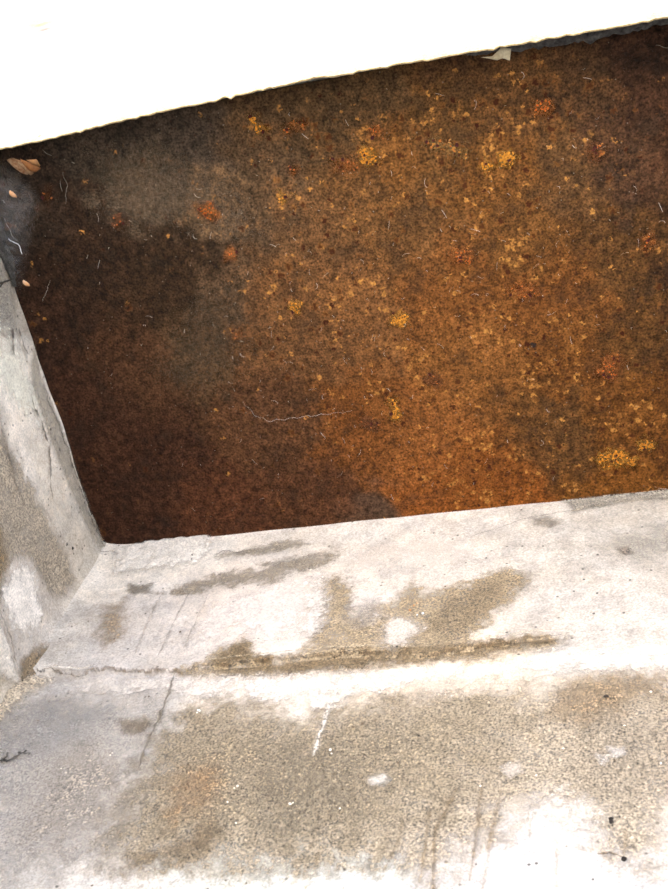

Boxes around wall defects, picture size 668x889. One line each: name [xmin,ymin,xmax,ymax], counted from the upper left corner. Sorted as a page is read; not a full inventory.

rust [533,99,555,116]
rust [247,115,269,134]
rust [329,125,384,172]
rust [425,138,468,159]
rust [480,150,520,172]
rust [390,311,409,328]
leakage [0,352,38,414]
rust [388,398,402,421]
rust [596,440,654,470]
leakage [0,416,74,632]
crack [37,629,561,770]
leakage [0,540,668,889]